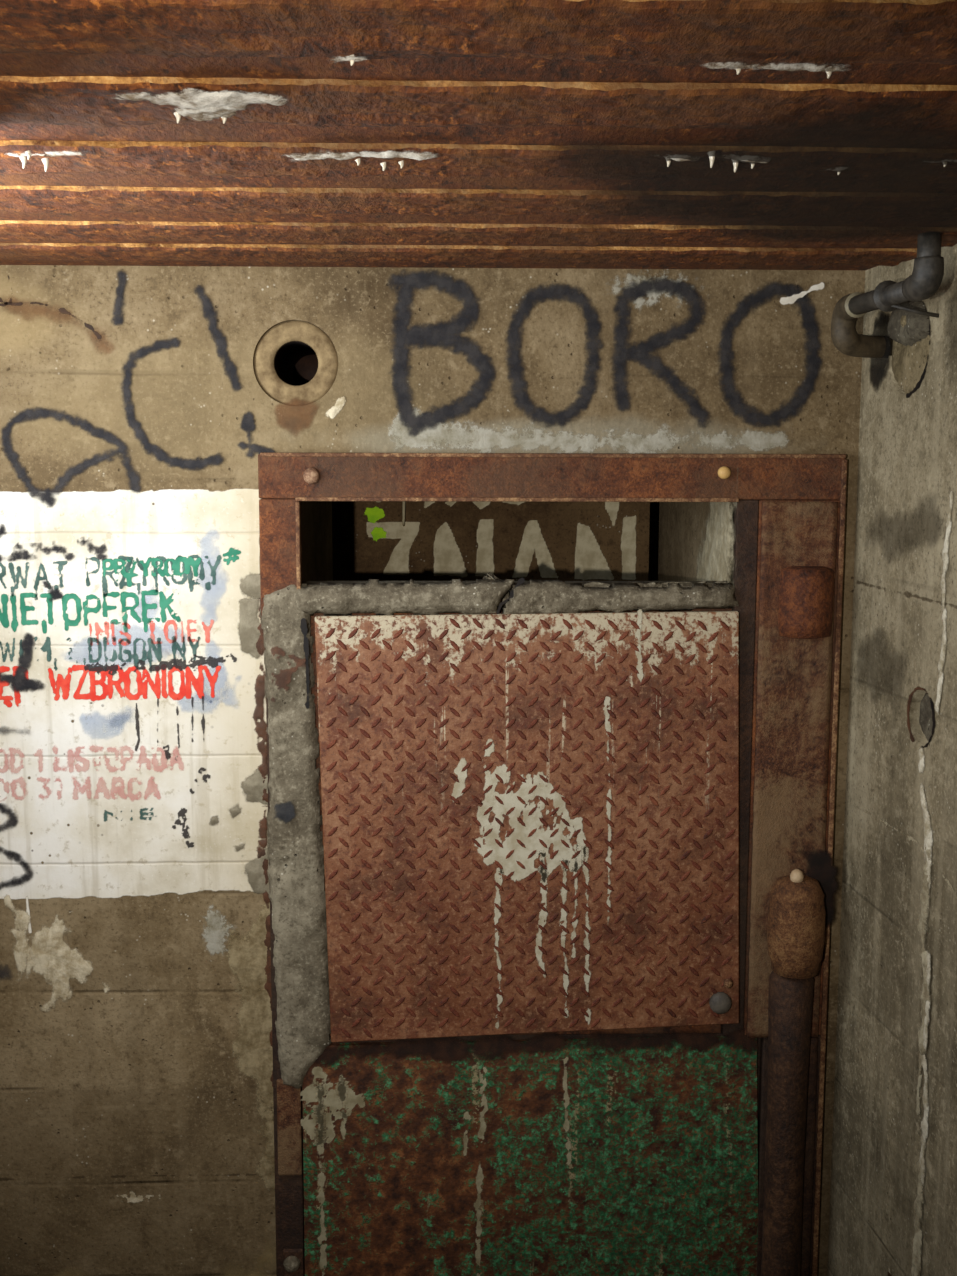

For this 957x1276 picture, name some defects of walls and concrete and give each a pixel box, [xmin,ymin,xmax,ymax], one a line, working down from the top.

water stain [703,62,846,79]
water stain [115,88,287,124]
water stain [7,150,83,172]
water stain [286,150,437,171]
water stain [935,491,953,712]
peeling [4,895,93,1012]
water stain [911,748,933,1276]